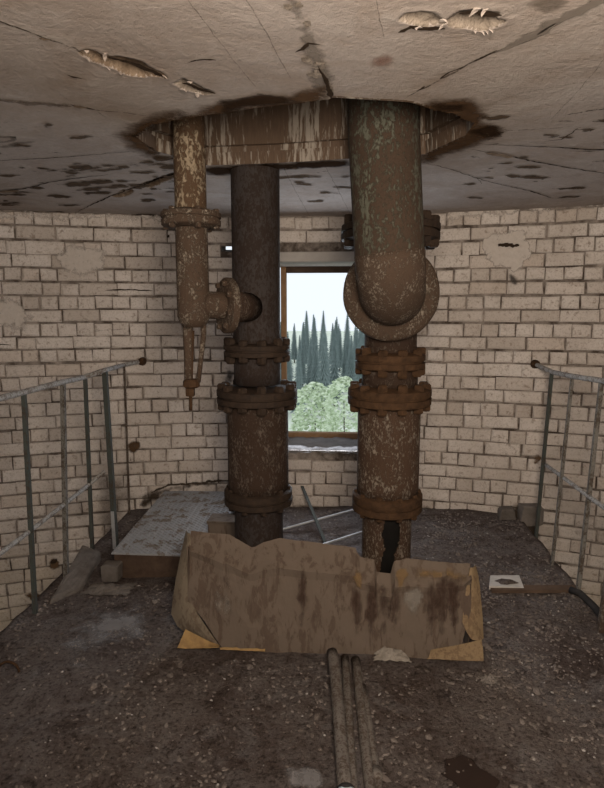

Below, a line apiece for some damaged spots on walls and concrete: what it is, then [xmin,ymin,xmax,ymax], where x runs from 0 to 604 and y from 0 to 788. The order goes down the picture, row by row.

crack [0,21,82,53]
spalling [68,45,223,98]
spalling [387,2,523,36]
crack [411,0,604,95]